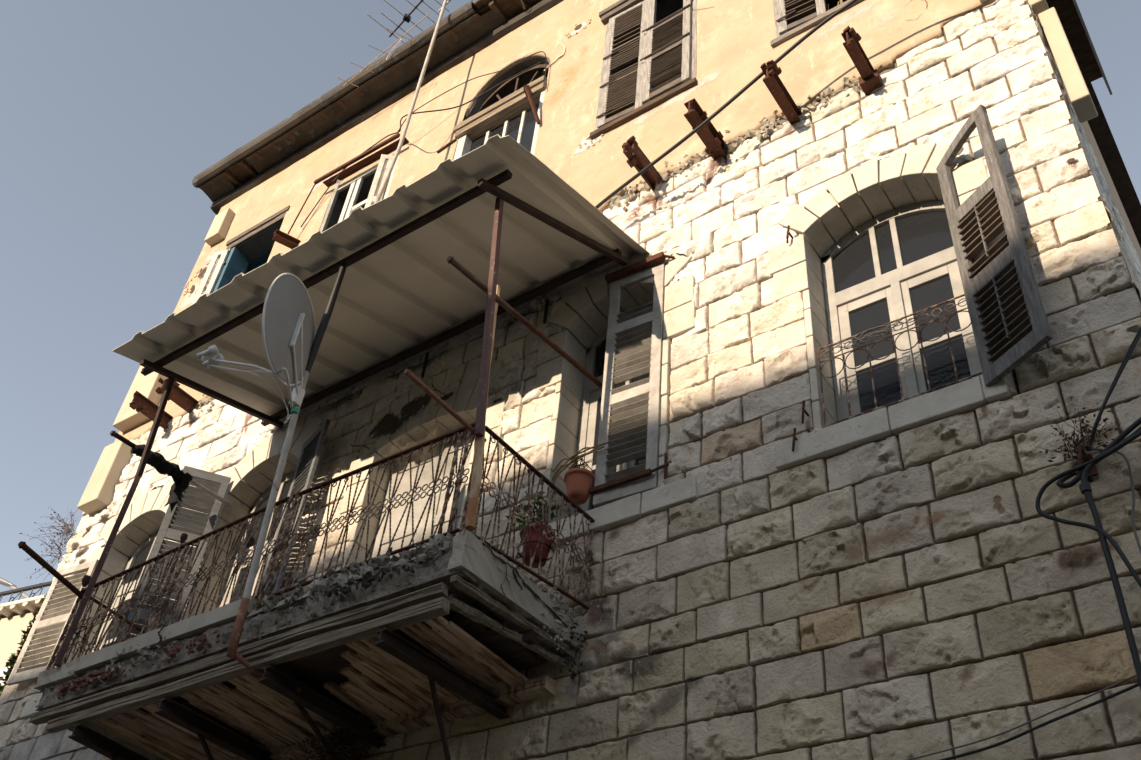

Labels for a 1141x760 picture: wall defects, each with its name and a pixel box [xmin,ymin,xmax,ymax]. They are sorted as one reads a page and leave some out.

peeling [663,72,720,108]
spalling [797,75,863,119]
spalling [724,110,787,153]
spalling [607,148,709,211]
rust [707,157,723,182]
spalling [180,249,226,310]
spalling [35,526,623,709]